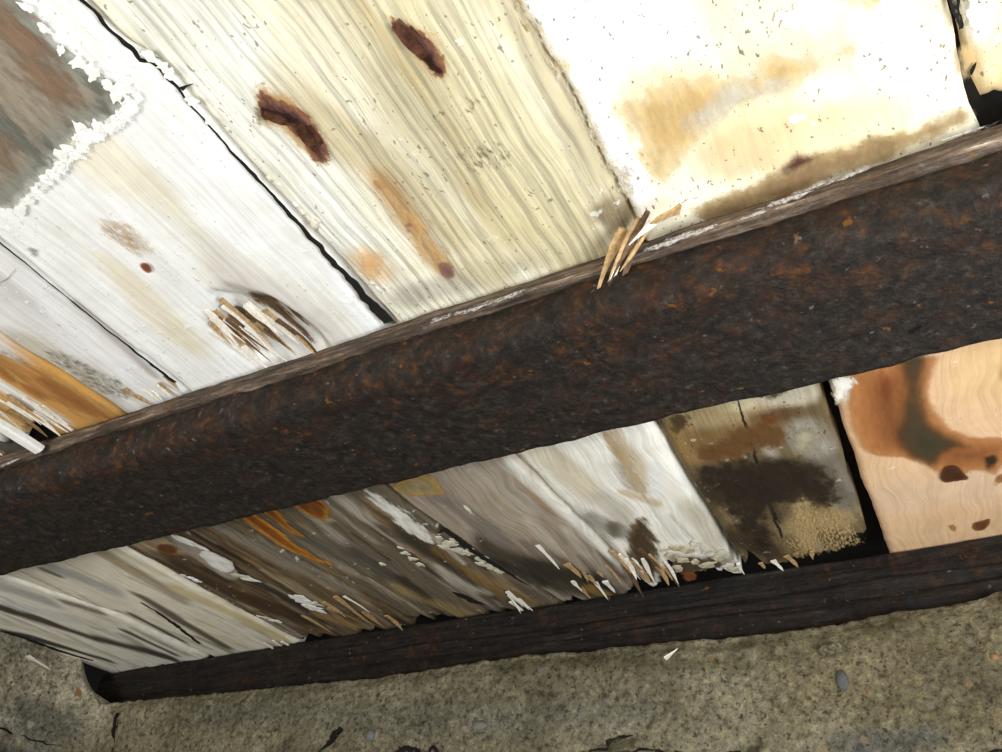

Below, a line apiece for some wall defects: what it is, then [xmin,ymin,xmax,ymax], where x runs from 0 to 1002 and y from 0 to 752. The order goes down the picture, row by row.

rust [391,16,446,78]
peeling [0,0,142,217]
rust [257,87,330,166]
leakage [623,56,814,181]
rust [697,110,969,220]
leakage [644,224,718,251]
rust [0,355,122,422]
leakage [832,356,1002,486]
leakage [698,415,862,558]
crack [111,713,120,750]
crack [319,726,343,751]
crack [600,735,679,752]